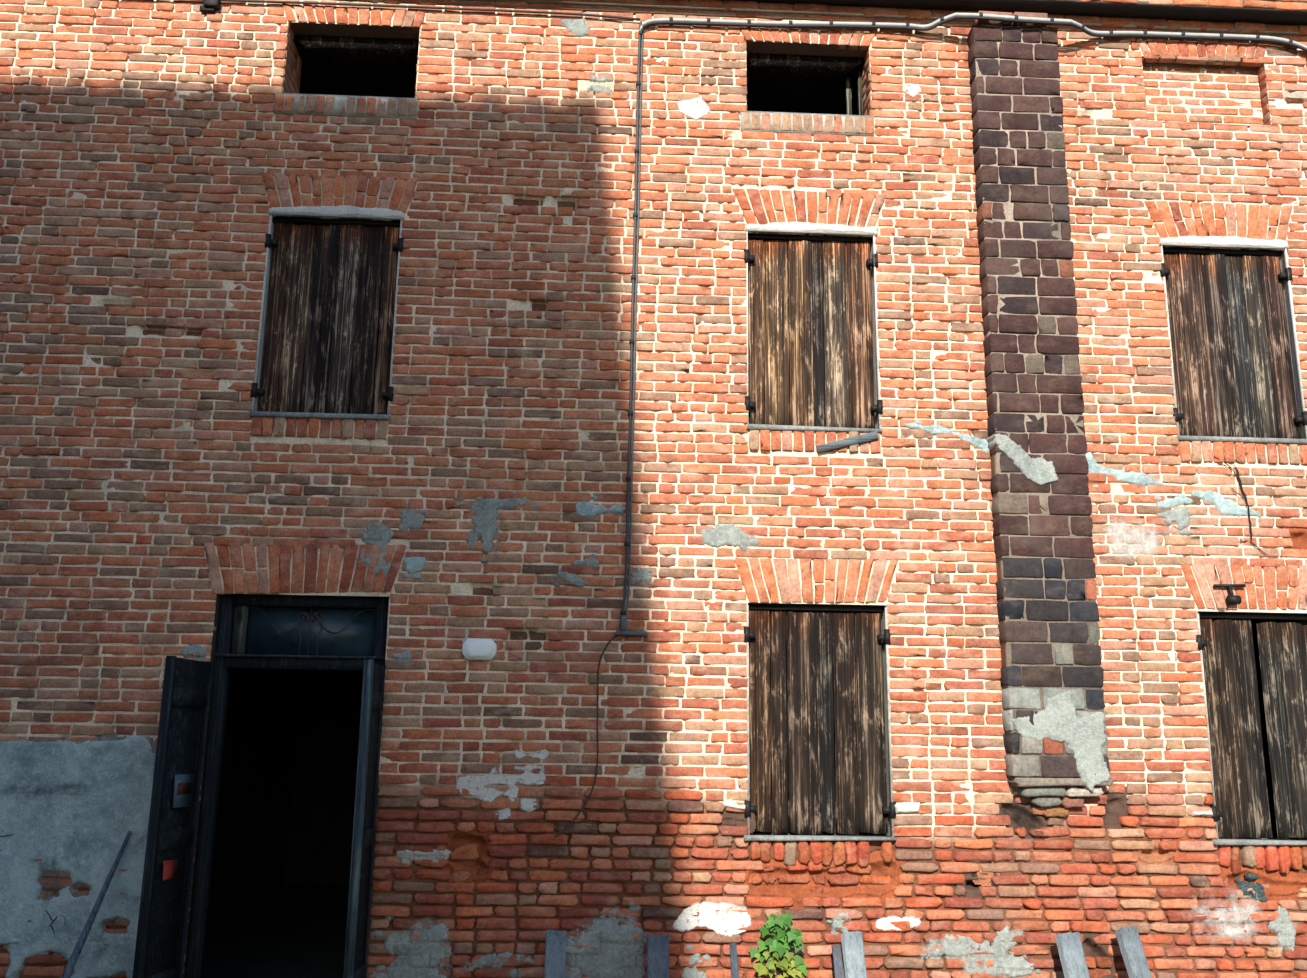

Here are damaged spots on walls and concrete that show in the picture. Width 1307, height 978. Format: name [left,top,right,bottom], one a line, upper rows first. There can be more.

crack [1214,452,1268,555]